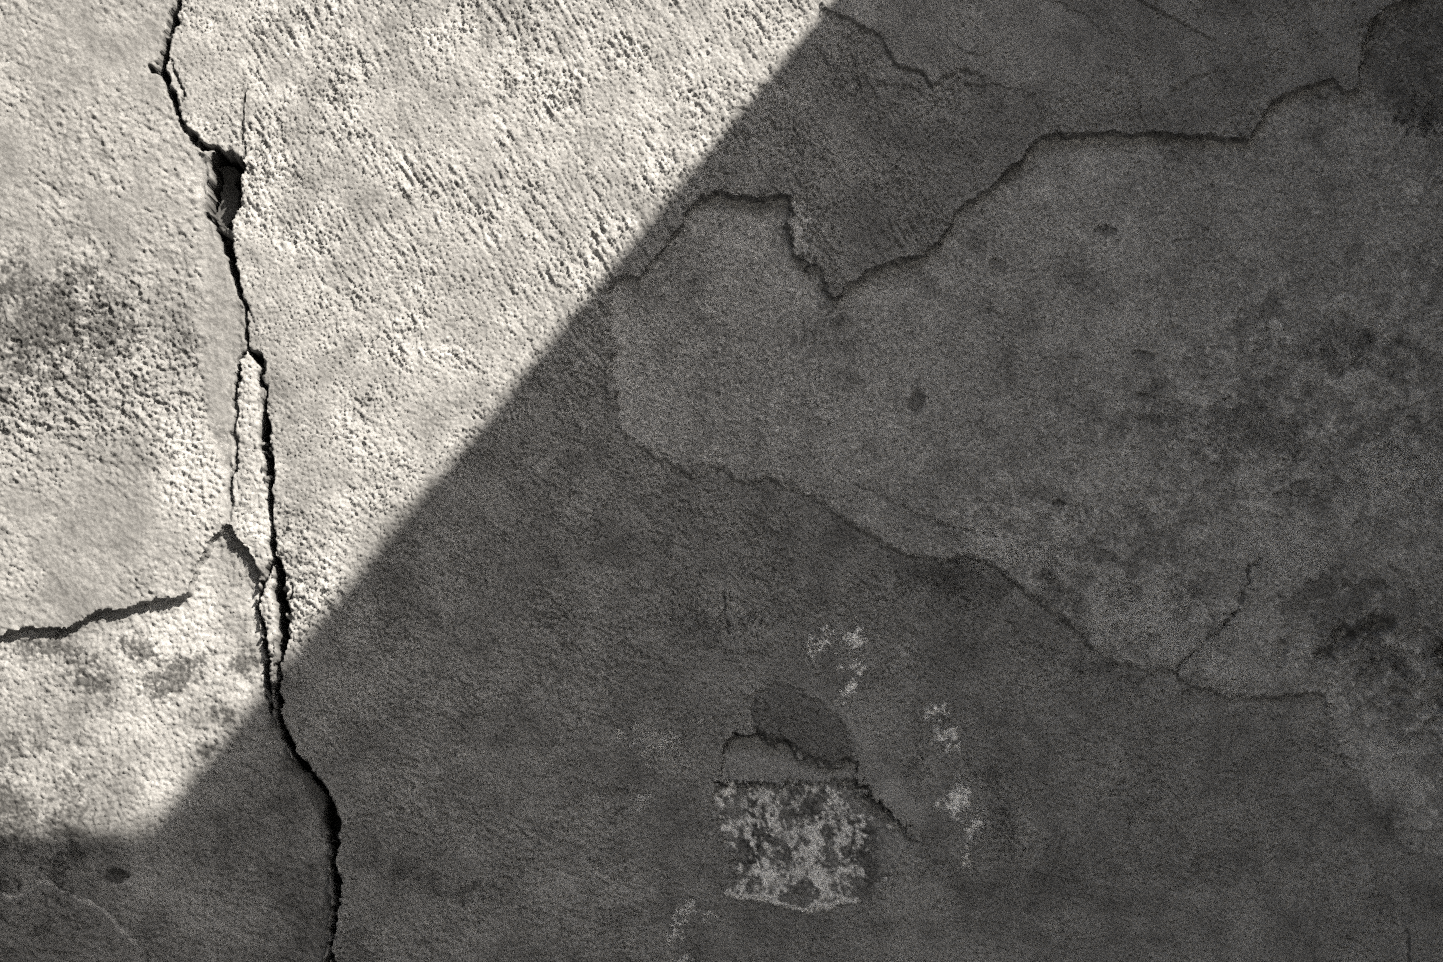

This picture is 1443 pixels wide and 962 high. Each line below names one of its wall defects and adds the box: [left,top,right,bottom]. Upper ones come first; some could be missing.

crack [149,60,187,102]
crack [193,93,247,245]
flaking render [604,0,1443,856]
crack [229,347,343,962]
flaking render [713,688,913,914]